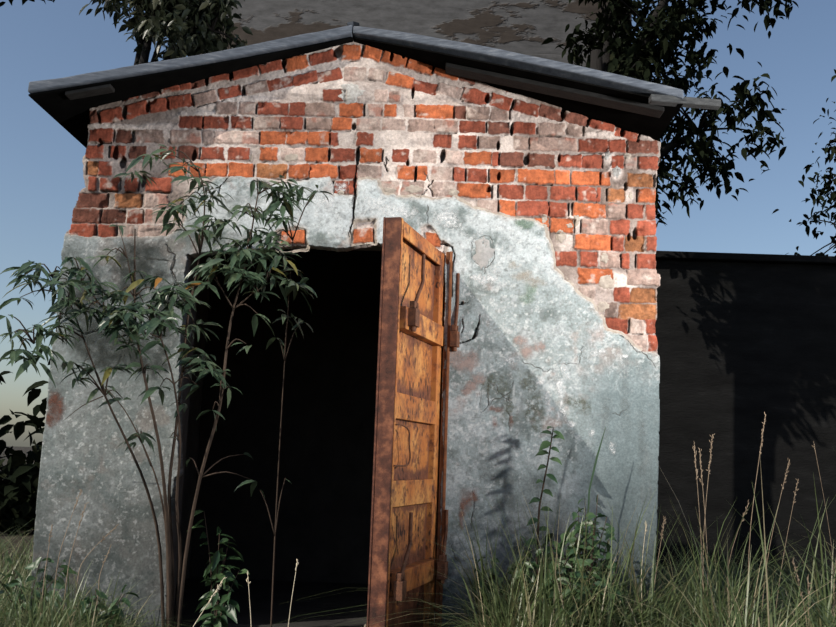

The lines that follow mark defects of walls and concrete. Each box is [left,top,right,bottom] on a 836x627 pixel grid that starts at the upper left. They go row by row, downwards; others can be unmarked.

crack [348,166,358,237]
spalling [274,227,310,253]
spalling [358,176,643,351]
crack [479,383,513,429]